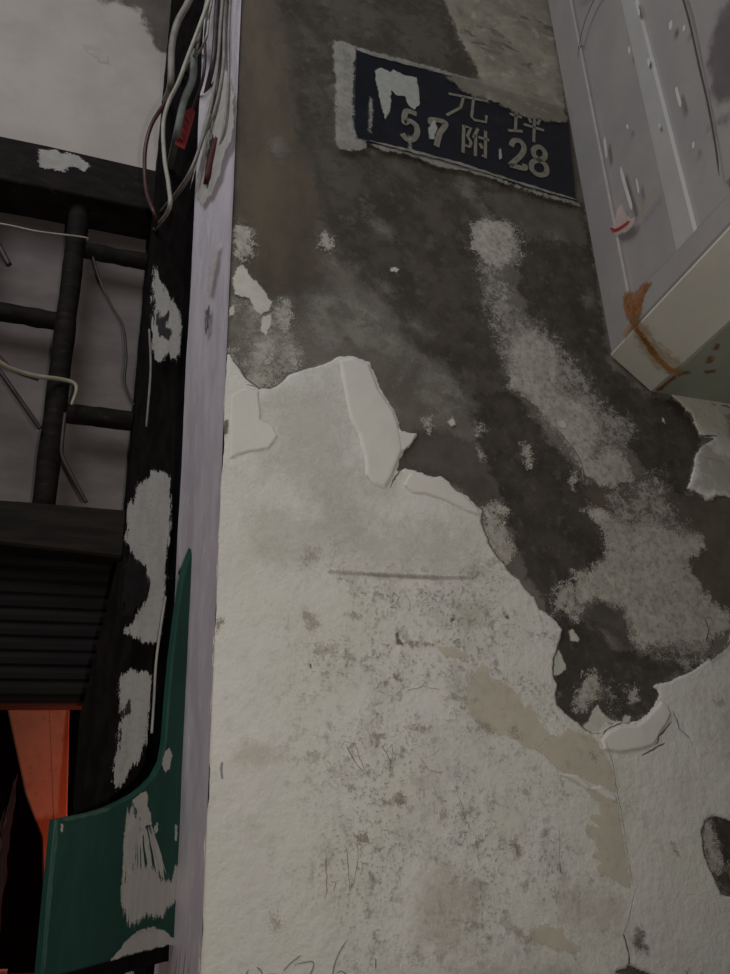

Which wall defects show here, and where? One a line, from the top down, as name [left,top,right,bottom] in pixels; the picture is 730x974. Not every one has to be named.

leakage [113,0,171,52]
peeling [38,149,90,172]
peeling [150,270,183,362]
leakage [227,0,730,724]
corrosion [622,282,690,393]
flaking render [190,1,730,897]
peeling [121,470,172,644]
crack [641,711,689,756]
crack [603,722,635,965]
flaking render [615,965,649,974]